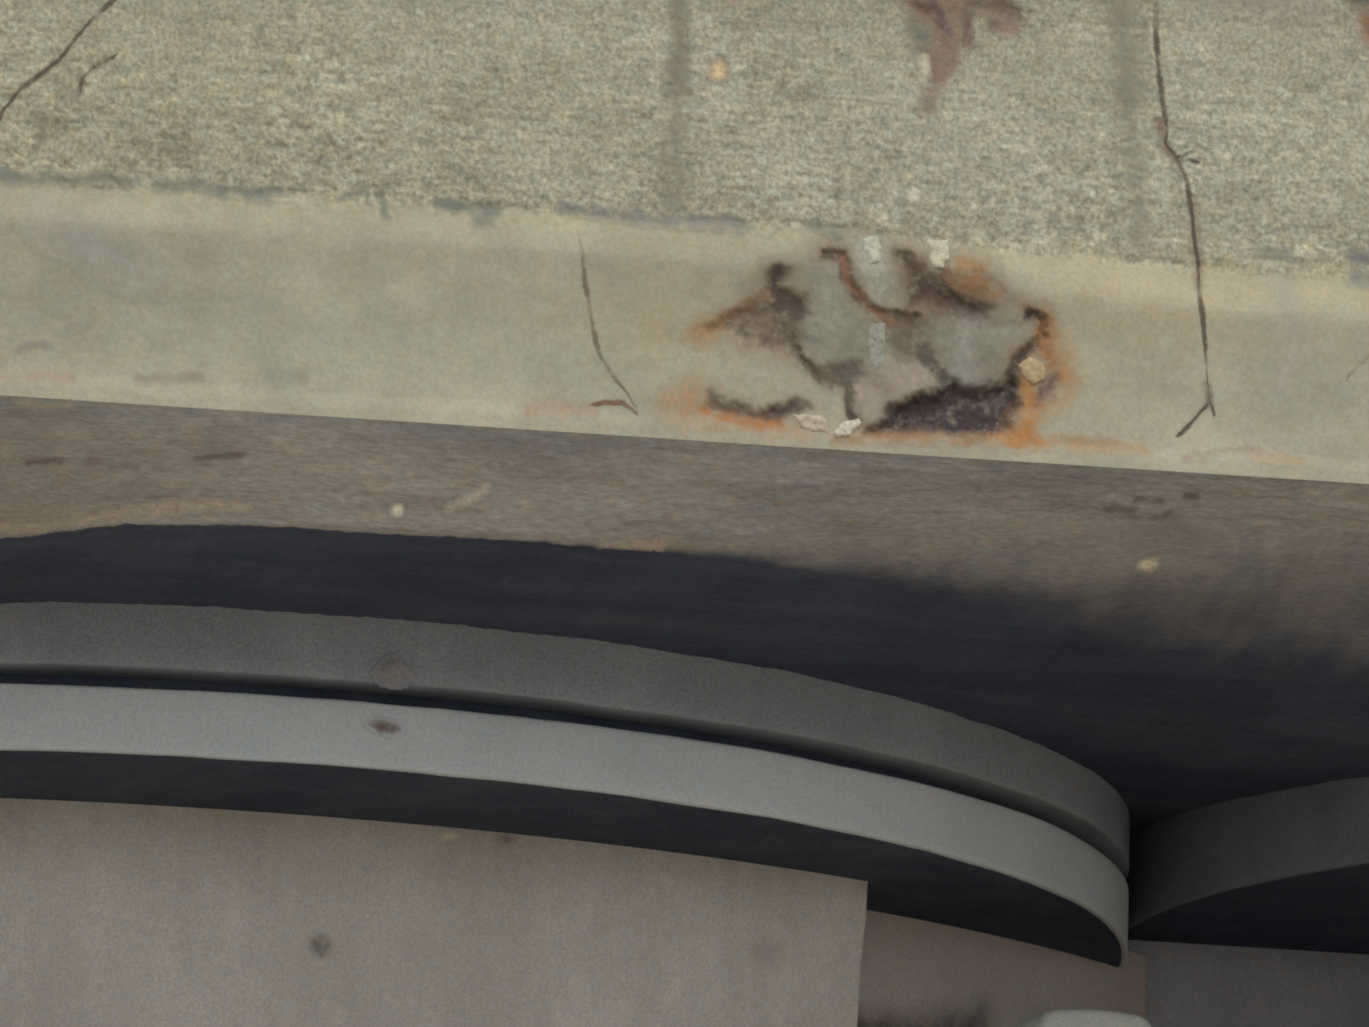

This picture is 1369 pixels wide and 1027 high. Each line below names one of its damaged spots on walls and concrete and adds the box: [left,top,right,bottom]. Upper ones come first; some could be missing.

crack [0,0,118,120]
spalling [906,185,922,205]
crack [1152,30,1216,438]
crack [583,268,638,415]
spalling [646,213,1121,463]